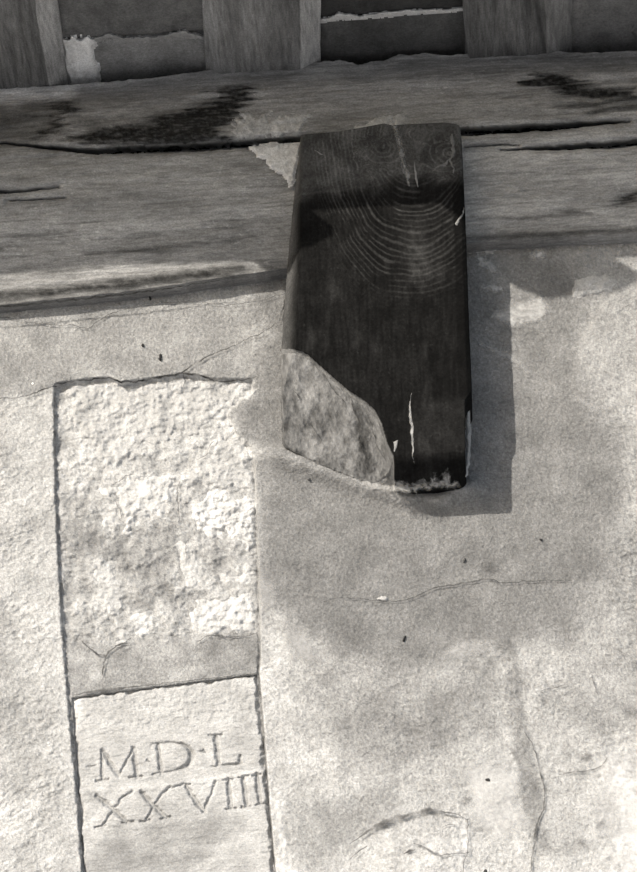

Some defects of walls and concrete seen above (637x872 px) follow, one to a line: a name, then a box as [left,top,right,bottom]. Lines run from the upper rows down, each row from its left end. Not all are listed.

water stain [70,86,254,148]
flaking render [572,274,618,298]
crack [0,280,286,399]
crack [324,579,571,602]